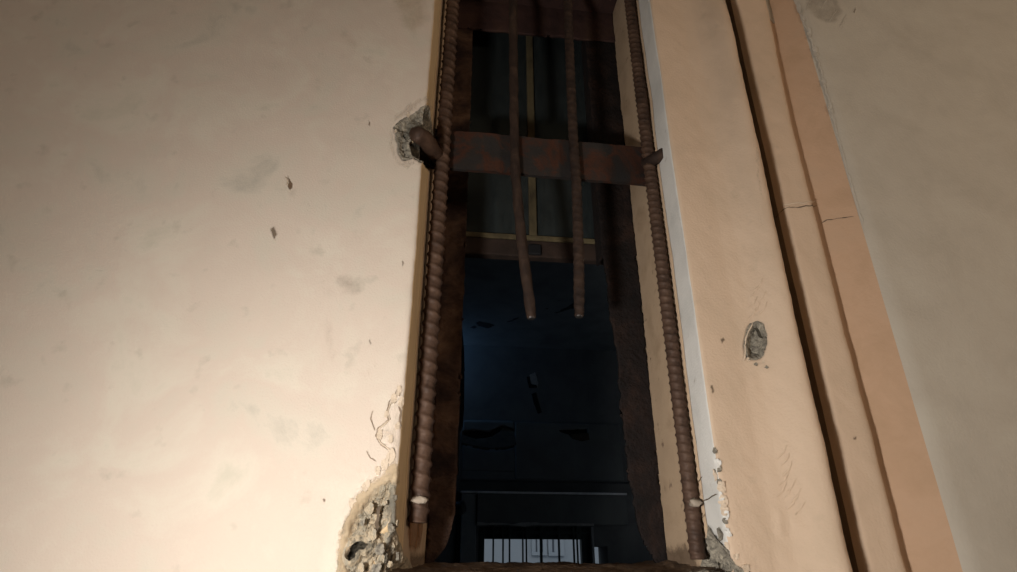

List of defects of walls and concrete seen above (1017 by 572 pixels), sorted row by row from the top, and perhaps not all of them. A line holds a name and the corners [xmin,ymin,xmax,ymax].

flaking render [393,105,434,168]
crack [776,201,853,223]
flaking render [743,321,769,369]
flaking render [336,385,412,572]
flaking render [689,447,750,572]